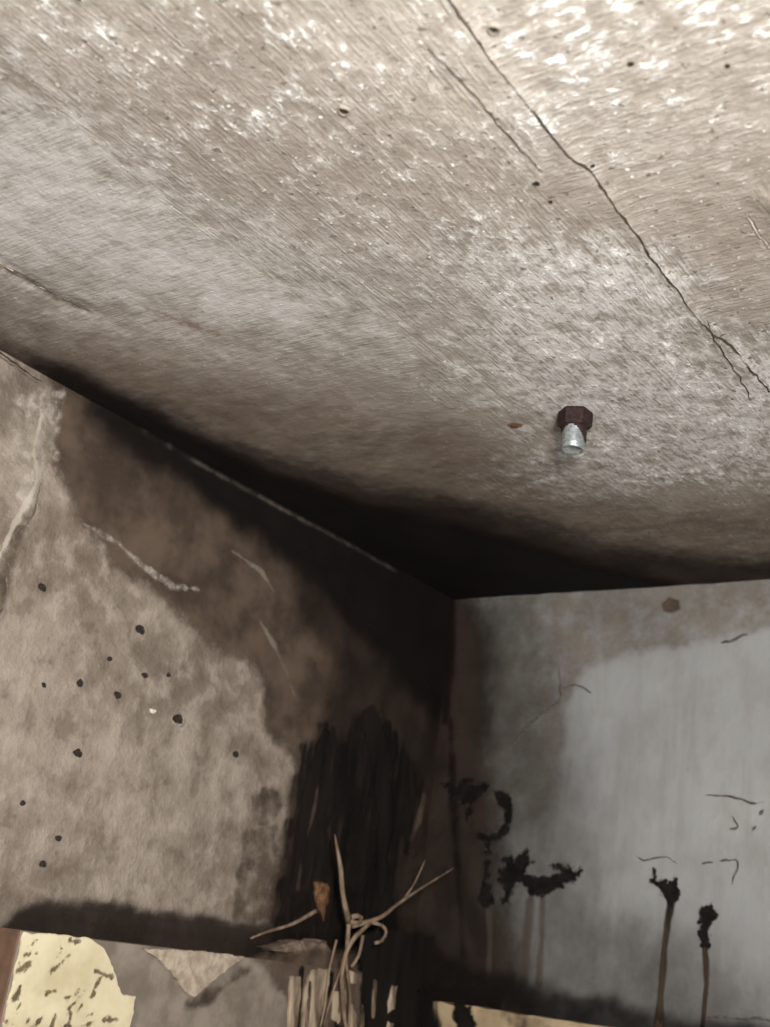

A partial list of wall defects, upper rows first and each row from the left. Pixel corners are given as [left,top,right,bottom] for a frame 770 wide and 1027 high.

crack [428,0,770,400]
rust [561,423,587,444]
water stain [0,364,770,1027]
crack [712,795,765,831]
crack [638,856,677,864]
crack [702,859,739,884]